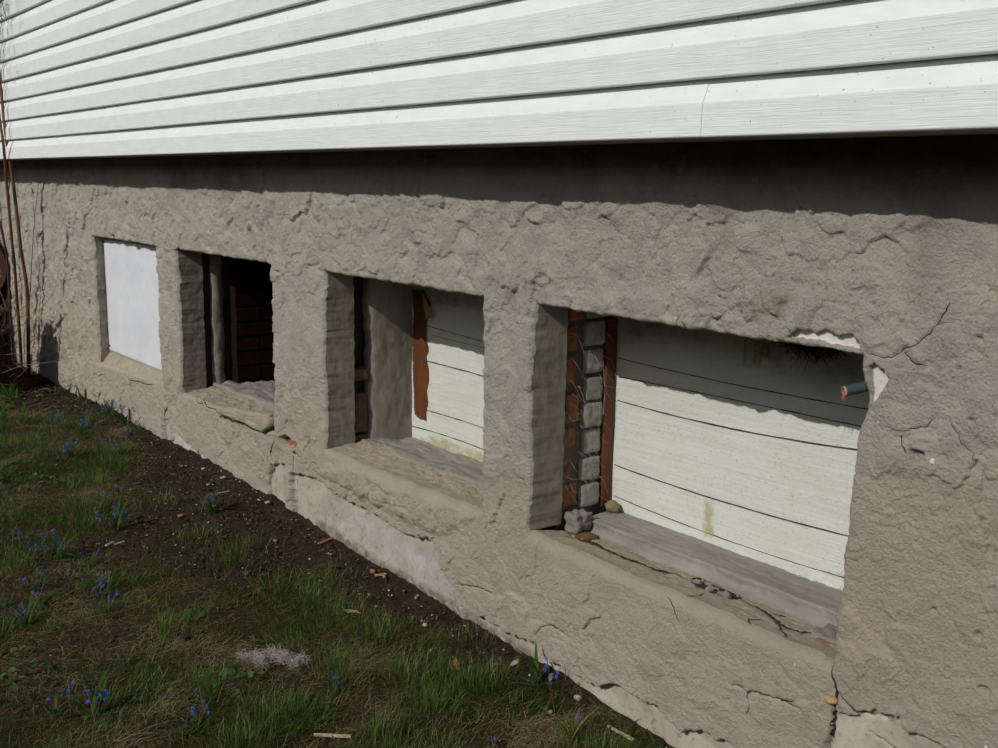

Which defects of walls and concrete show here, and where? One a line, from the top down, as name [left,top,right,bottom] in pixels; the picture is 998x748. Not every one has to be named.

crack [868,302,951,367]
crack [891,419,978,462]
crack [732,685,798,714]
crack [829,665,895,748]